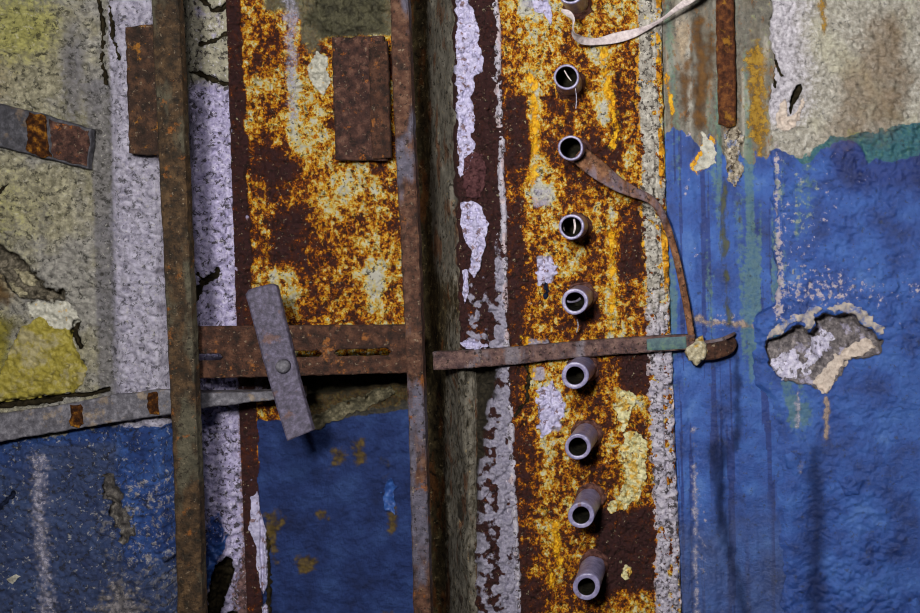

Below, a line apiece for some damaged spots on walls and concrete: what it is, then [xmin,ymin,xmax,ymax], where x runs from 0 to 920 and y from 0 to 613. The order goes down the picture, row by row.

crack [97,0,121,85]
corrosion [226,0,405,326]
corrosion [526,73,540,186]
corrosion [599,46,621,149]
flaking render [776,98,805,132]
flaking render [0,244,87,403]
corrosion [336,348,391,356]
corrosion [607,231,618,333]
spalling [765,302,885,394]
corrosion [238,373,414,613]
peeling [206,533,229,590]
corrosion [548,521,563,588]